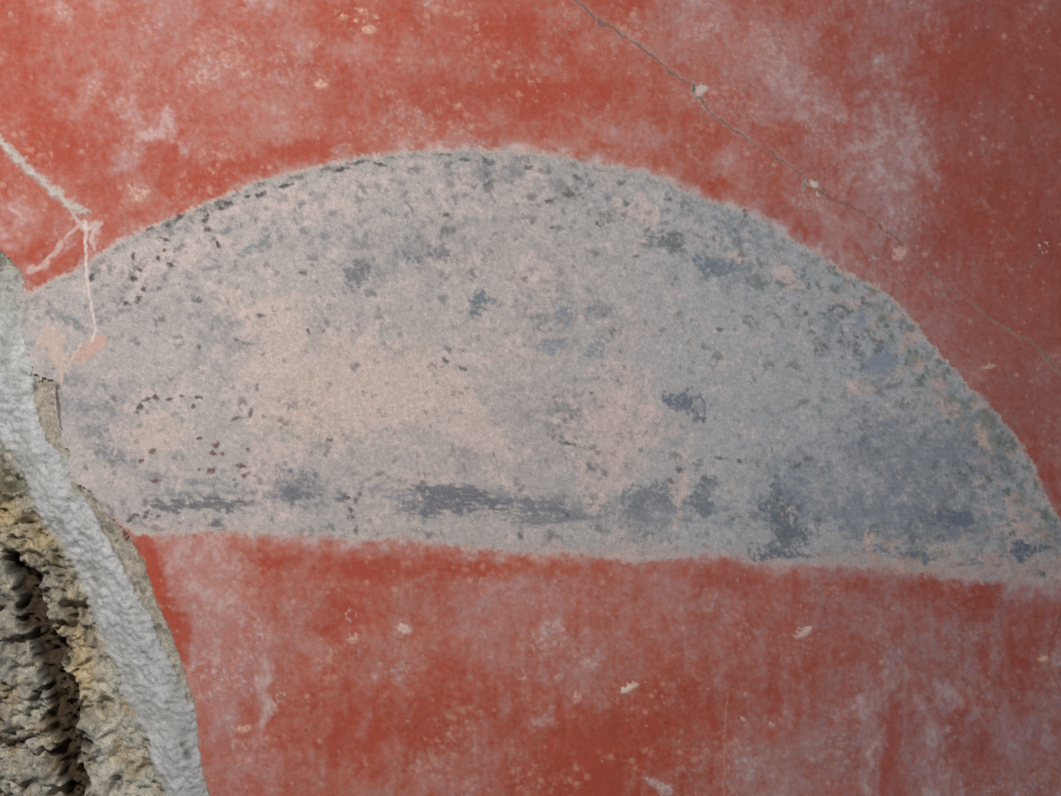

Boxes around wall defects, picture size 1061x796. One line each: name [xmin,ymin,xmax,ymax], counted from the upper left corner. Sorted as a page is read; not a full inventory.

spalling [121,174,152,209]
crack [569,0,1061,381]
peeling [28,229,84,286]
spalling [883,236,918,270]
crack [0,131,105,432]
peeling [73,333,110,369]
peeling [992,434,1011,454]
peeling [1036,512,1060,524]
spalling [386,617,423,646]
spalling [784,608,827,654]
spalling [613,675,647,703]
spalling [634,768,694,796]